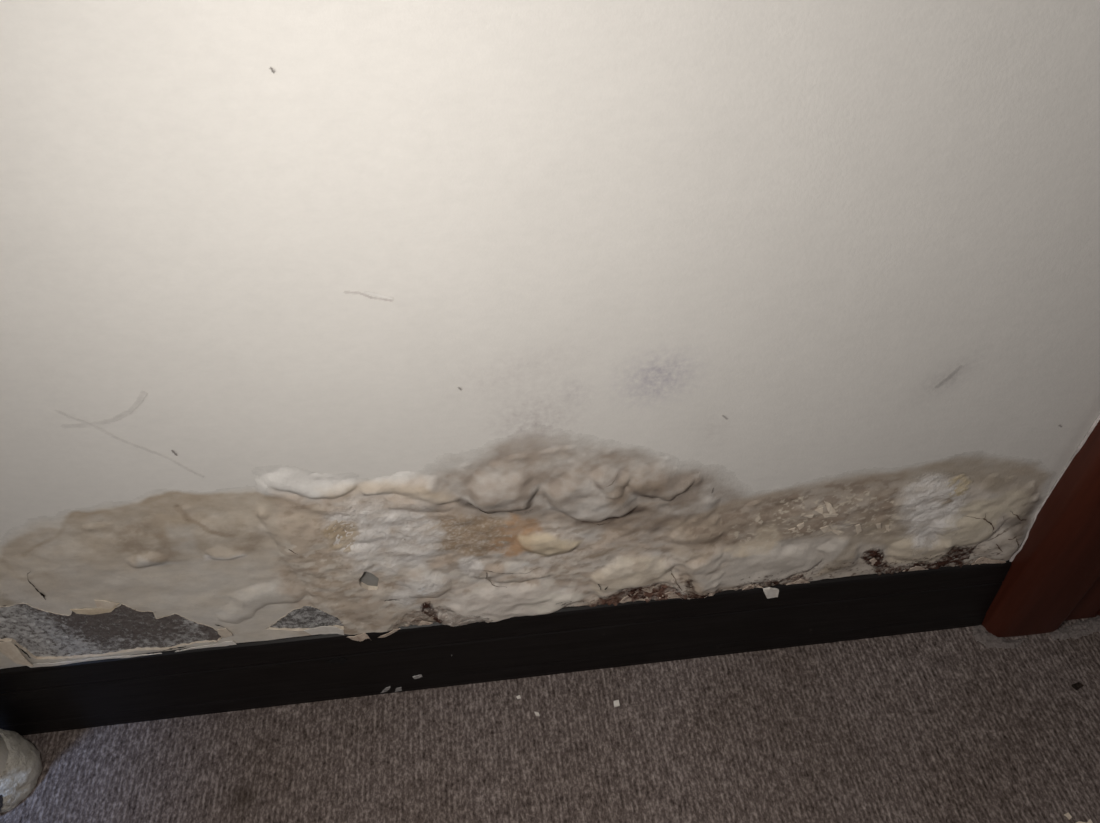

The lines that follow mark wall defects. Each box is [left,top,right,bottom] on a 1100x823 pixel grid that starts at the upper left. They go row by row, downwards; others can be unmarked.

water stain [0,423,1057,669]
flaking render [860,546,1006,575]
flaking render [585,573,813,607]
peeling [0,599,236,668]
peeling [266,601,493,641]